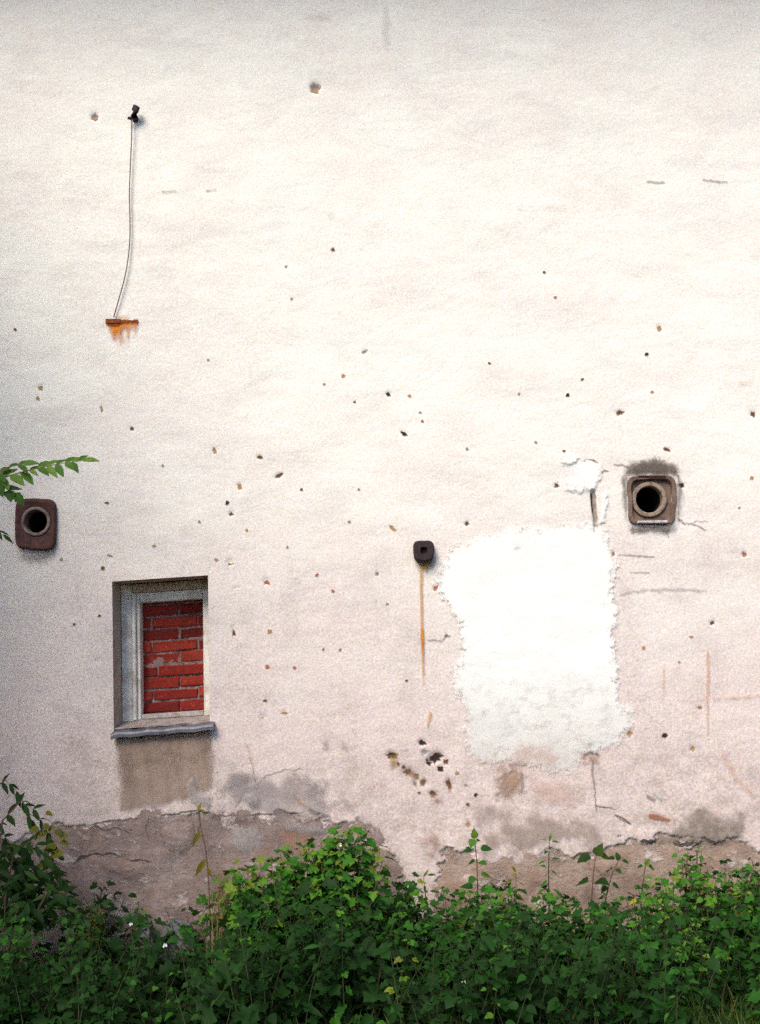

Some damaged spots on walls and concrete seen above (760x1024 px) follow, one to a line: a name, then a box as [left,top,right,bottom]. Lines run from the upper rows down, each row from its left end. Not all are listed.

rust [105,319,138,337]
rust [420,561,431,674]
damp [119,730,211,808]
spalling [386,739,478,807]
damp [657,808,743,843]
peeling [0,809,412,972]
peeling [432,814,760,948]